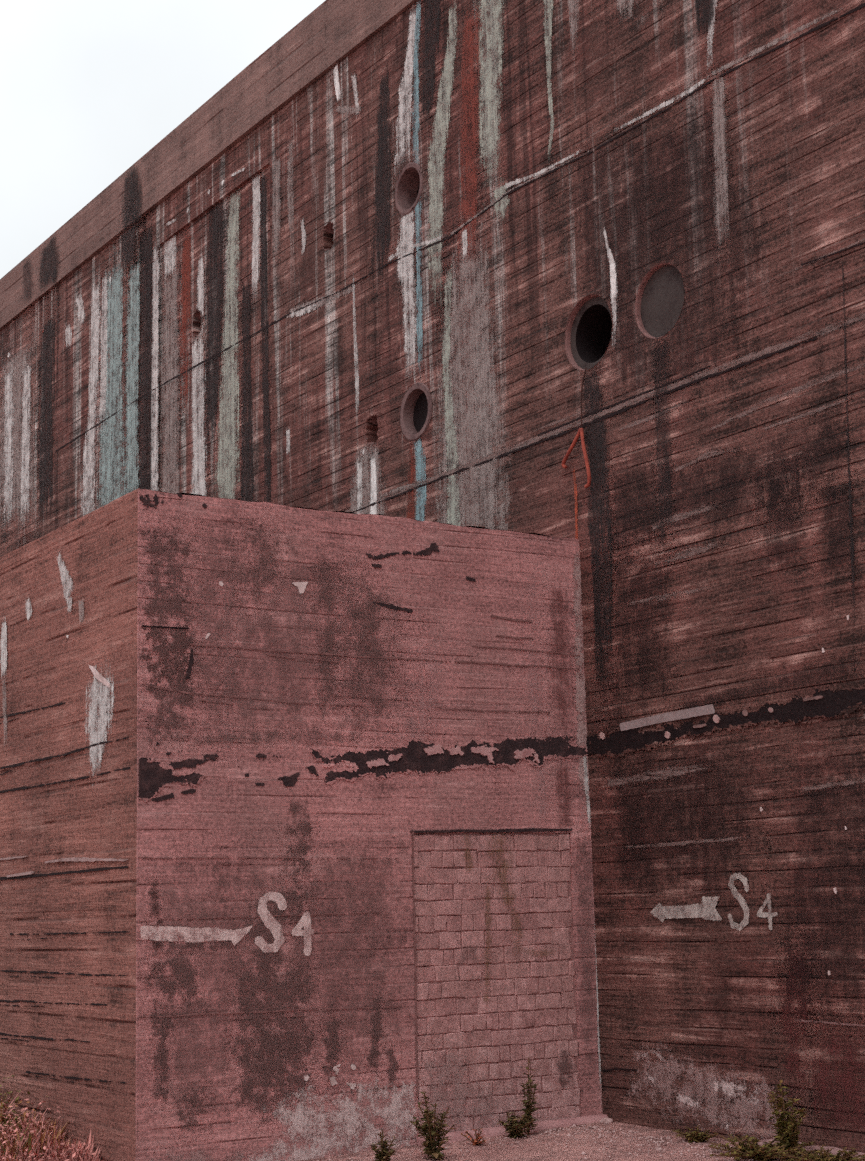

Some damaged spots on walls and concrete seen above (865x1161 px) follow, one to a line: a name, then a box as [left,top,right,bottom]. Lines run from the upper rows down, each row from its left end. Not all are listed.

leakage [494,0,579,217]
leakage [624,0,834,239]
leakage [139,528,210,743]
spalling [138,741,219,804]
leakage [292,582,308,594]
spalling [366,543,440,568]
spalling [278,553,865,823]
leakage [148,881,230,1130]
leakage [227,802,498,1161]